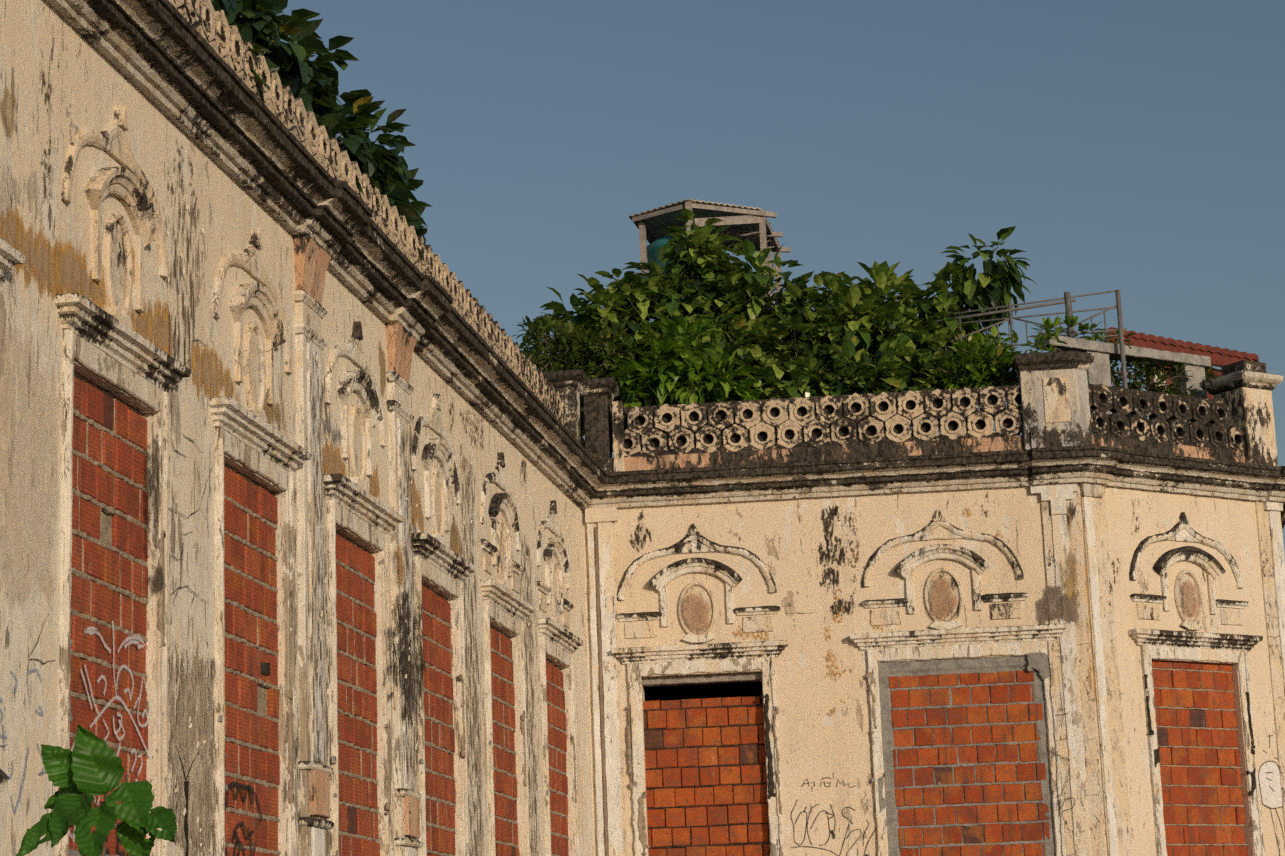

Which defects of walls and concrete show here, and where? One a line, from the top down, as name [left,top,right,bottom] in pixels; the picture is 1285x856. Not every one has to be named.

damp [323,342,386,442]
damp [421,403,484,487]
damp [817,506,859,617]
damp [1039,503,1079,624]
damp [388,588,426,729]